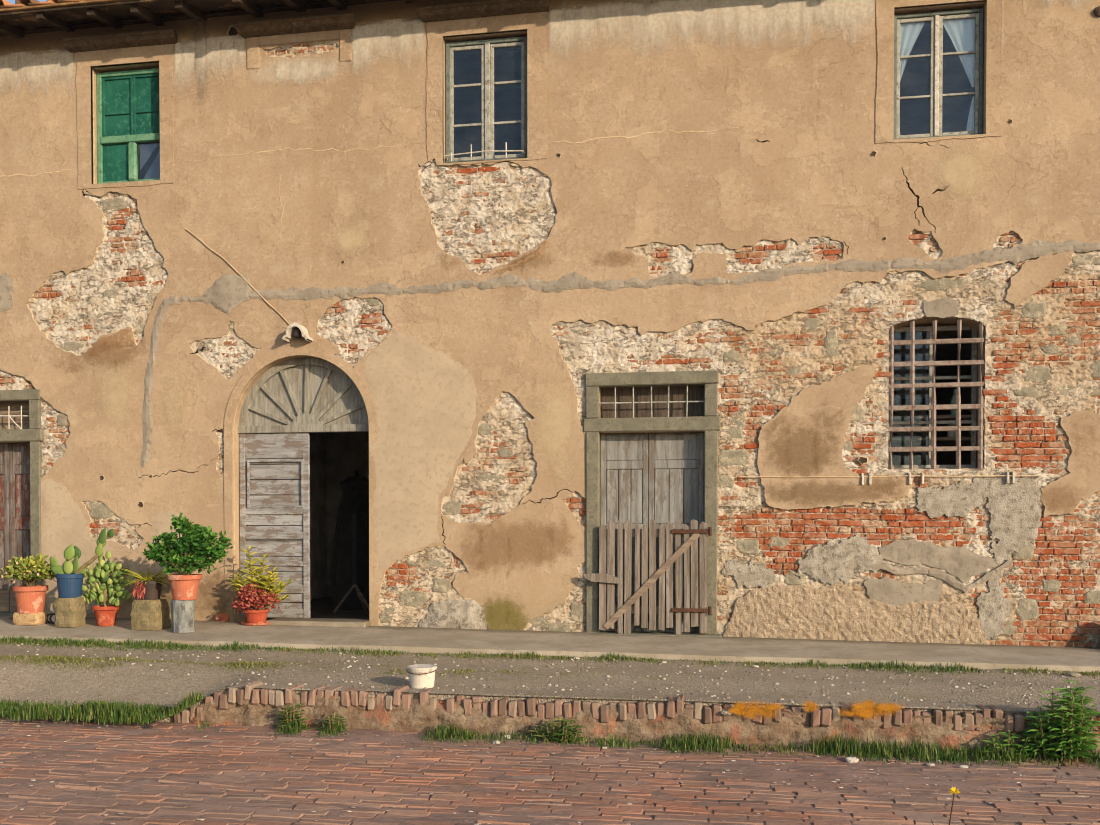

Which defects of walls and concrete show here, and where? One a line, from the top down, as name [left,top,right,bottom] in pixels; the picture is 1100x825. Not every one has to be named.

flaking render [28,192,169,355]
flaking render [418,160,557,275]
flaking render [627,237,848,278]
crack [902,170,949,229]
flaking render [189,321,261,379]
flaking render [316,297,392,368]
flaking render [0,369,71,477]
crack [139,429,222,478]
flaking render [442,392,537,524]
crack [524,489,584,504]
flaking render [551,250,1100,648]
flaking render [378,545,482,627]